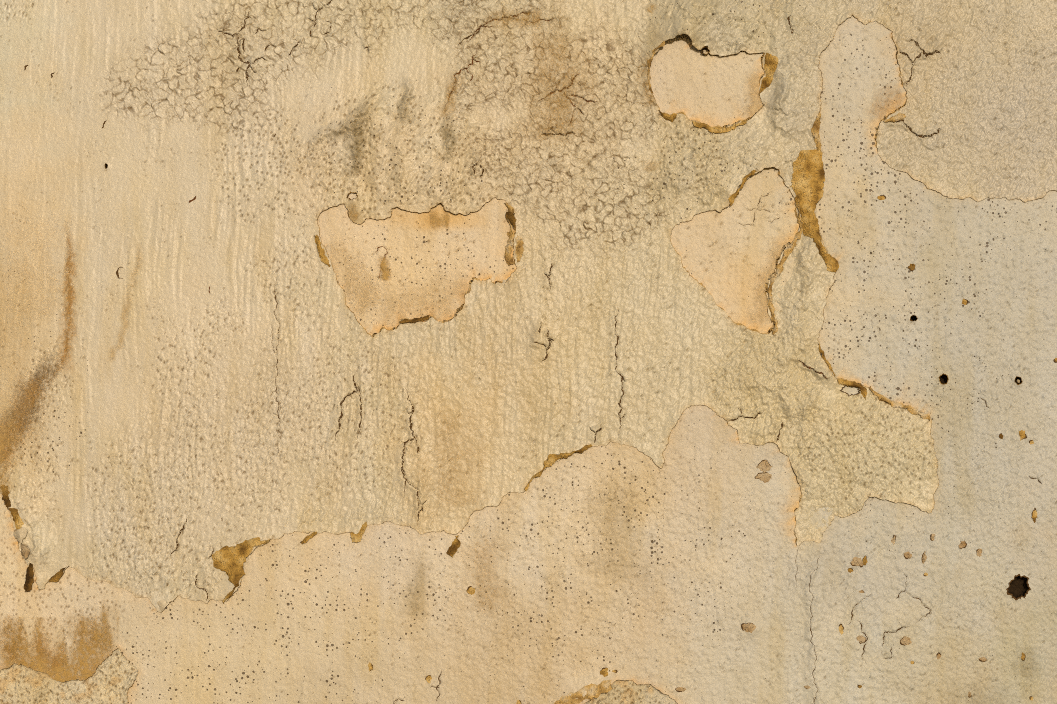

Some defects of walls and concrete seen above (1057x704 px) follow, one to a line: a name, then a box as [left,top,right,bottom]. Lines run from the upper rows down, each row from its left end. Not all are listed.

crack [102,0,662,245]
peeling [647,34,778,133]
peeling [314,192,527,338]
peeling [670,167,803,334]
crack [401,392,426,519]
spalling [1008,576,1029,598]
damp [3,613,111,682]
flaking render [0,647,139,704]
flaking render [554,680,678,704]